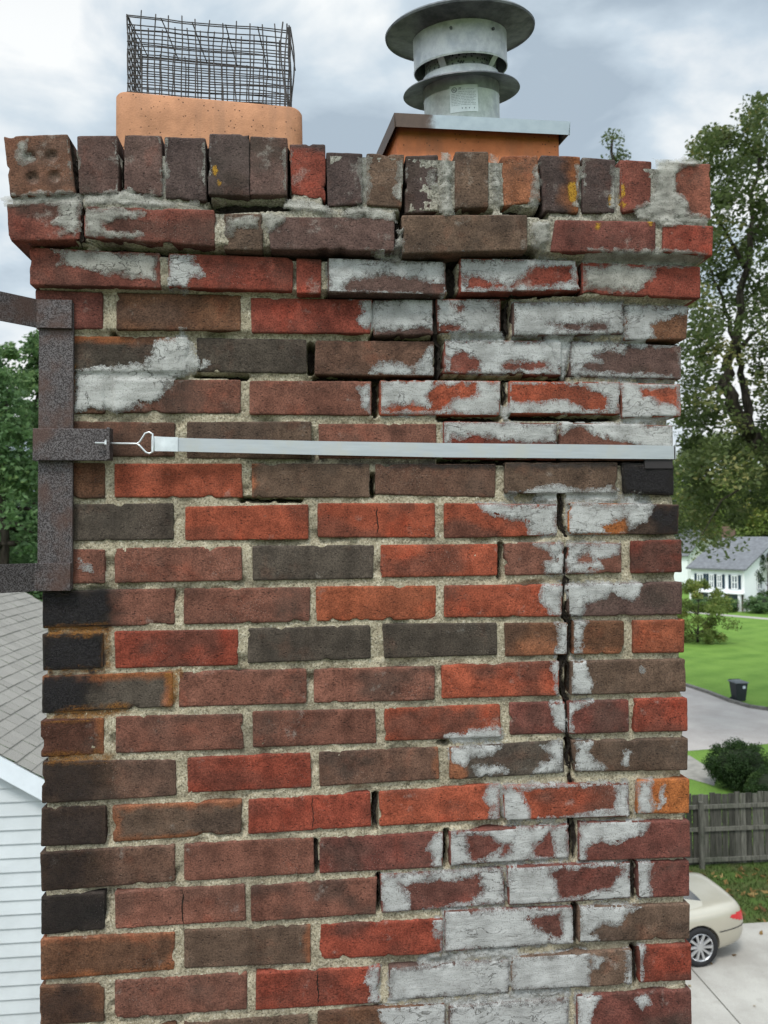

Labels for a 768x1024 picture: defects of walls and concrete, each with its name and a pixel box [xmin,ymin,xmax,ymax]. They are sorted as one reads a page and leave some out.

crack [557,494,573,783]
crack [370,797,378,825]
crack [311,798,319,871]
crack [569,817,577,857]
crack [375,876,383,908]
crack [628,861,636,895]
crack [570,904,578,939]
crack [630,946,638,983]